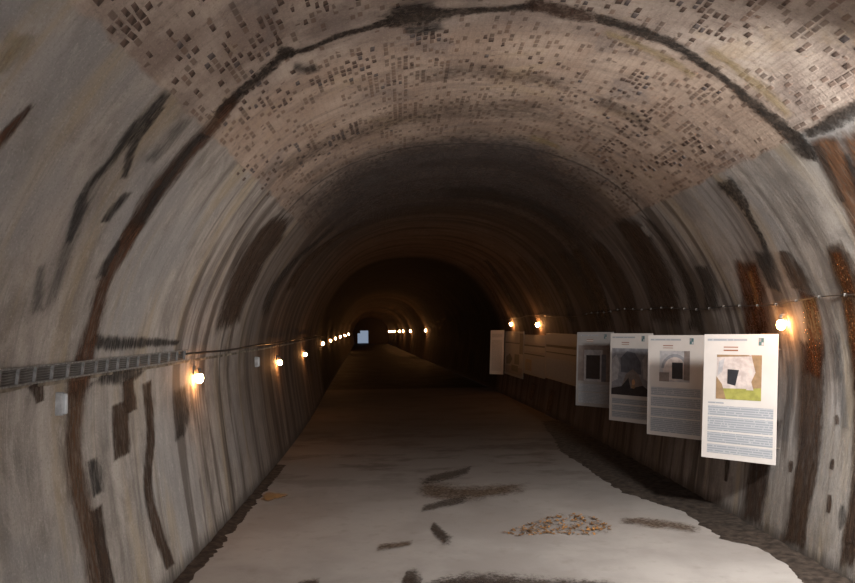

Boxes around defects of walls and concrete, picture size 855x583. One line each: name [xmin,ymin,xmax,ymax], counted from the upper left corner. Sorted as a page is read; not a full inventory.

crack [216,0,855,161]
rust [814,133,855,232]
leakage [29,384,44,404]
rust [737,251,825,548]
rust [828,243,855,566]